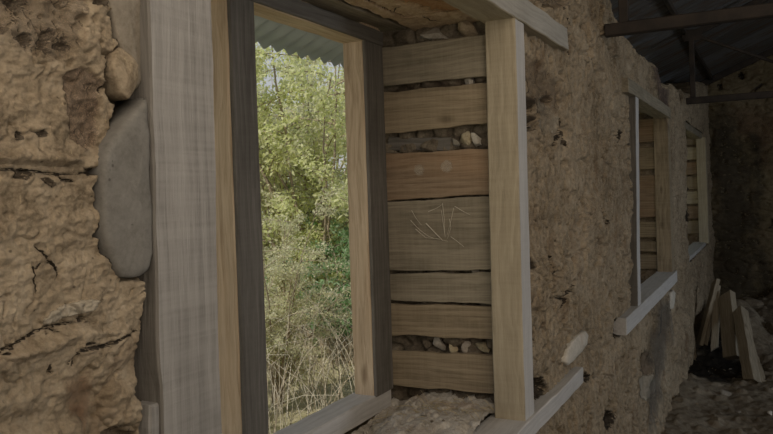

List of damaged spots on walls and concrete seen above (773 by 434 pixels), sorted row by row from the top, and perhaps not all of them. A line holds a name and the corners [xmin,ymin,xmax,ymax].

crack [0,168,96,182]
crack [31,247,58,292]
crack [0,321,76,355]
crack [46,330,138,374]